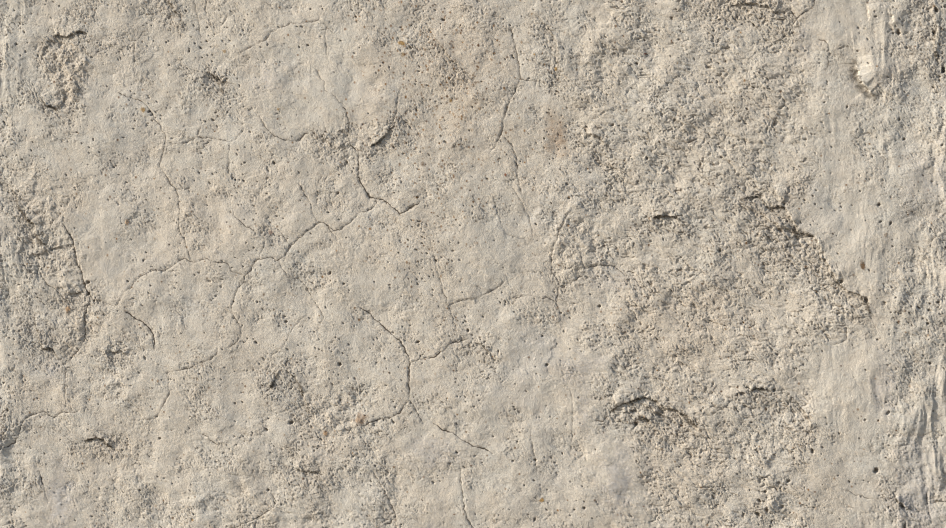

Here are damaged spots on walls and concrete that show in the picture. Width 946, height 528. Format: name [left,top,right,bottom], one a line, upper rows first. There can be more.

crack [495,28,552,191]
crack [63,225,91,389]
crack [120,93,419,370]
crack [361,308,489,451]
crack [433,215,622,302]